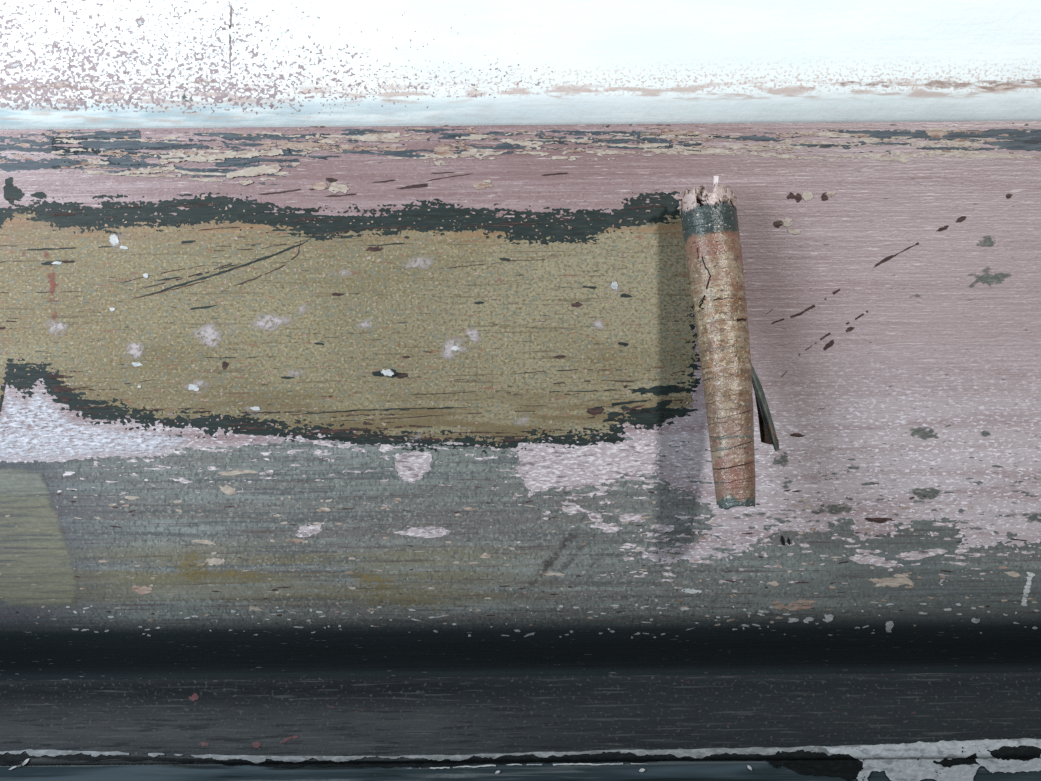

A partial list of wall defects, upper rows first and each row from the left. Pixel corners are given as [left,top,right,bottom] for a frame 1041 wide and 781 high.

peeling [0,122,1041,185]
peeling [310,178,350,194]
peeling [674,184,708,209]
peeling [787,191,836,203]
peeling [774,218,800,234]
peeling [0,424,1041,667]
peeling [765,739,1041,781]